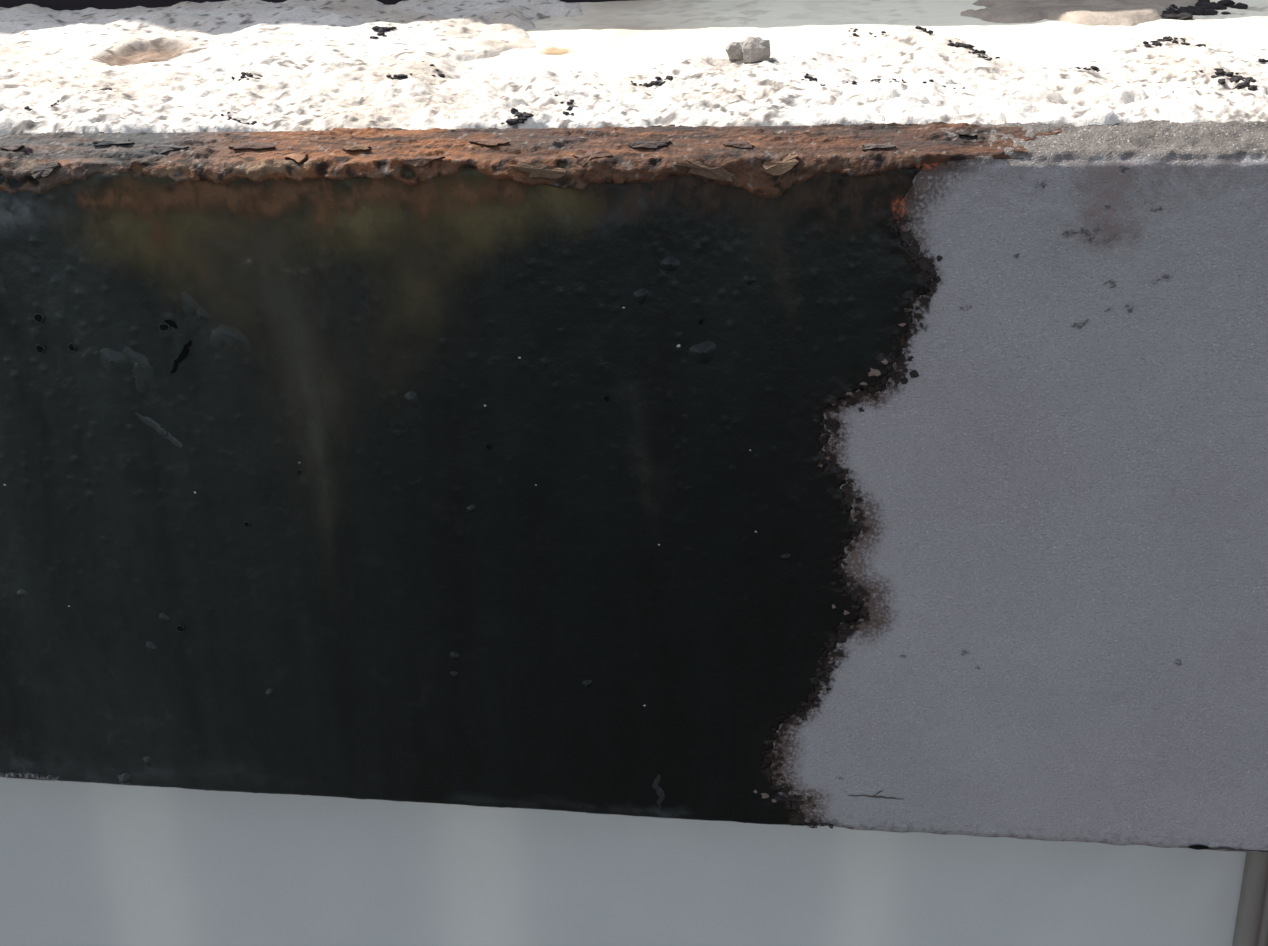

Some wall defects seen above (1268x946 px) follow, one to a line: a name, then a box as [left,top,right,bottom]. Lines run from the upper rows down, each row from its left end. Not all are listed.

damp [110,185,577,284]
corrosion [0,121,1062,257]
peeling [753,213,943,829]